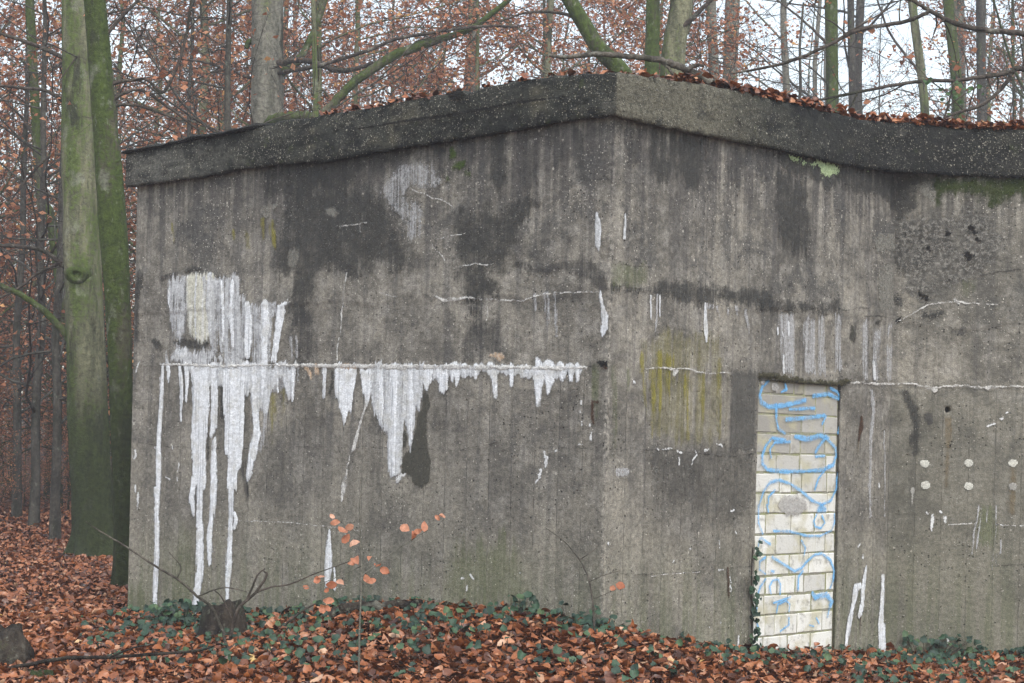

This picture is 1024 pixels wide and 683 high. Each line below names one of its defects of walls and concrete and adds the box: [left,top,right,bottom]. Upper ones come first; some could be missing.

water stain [629,129,710,188]
water stain [759,151,935,260]
water stain [151,128,584,614]